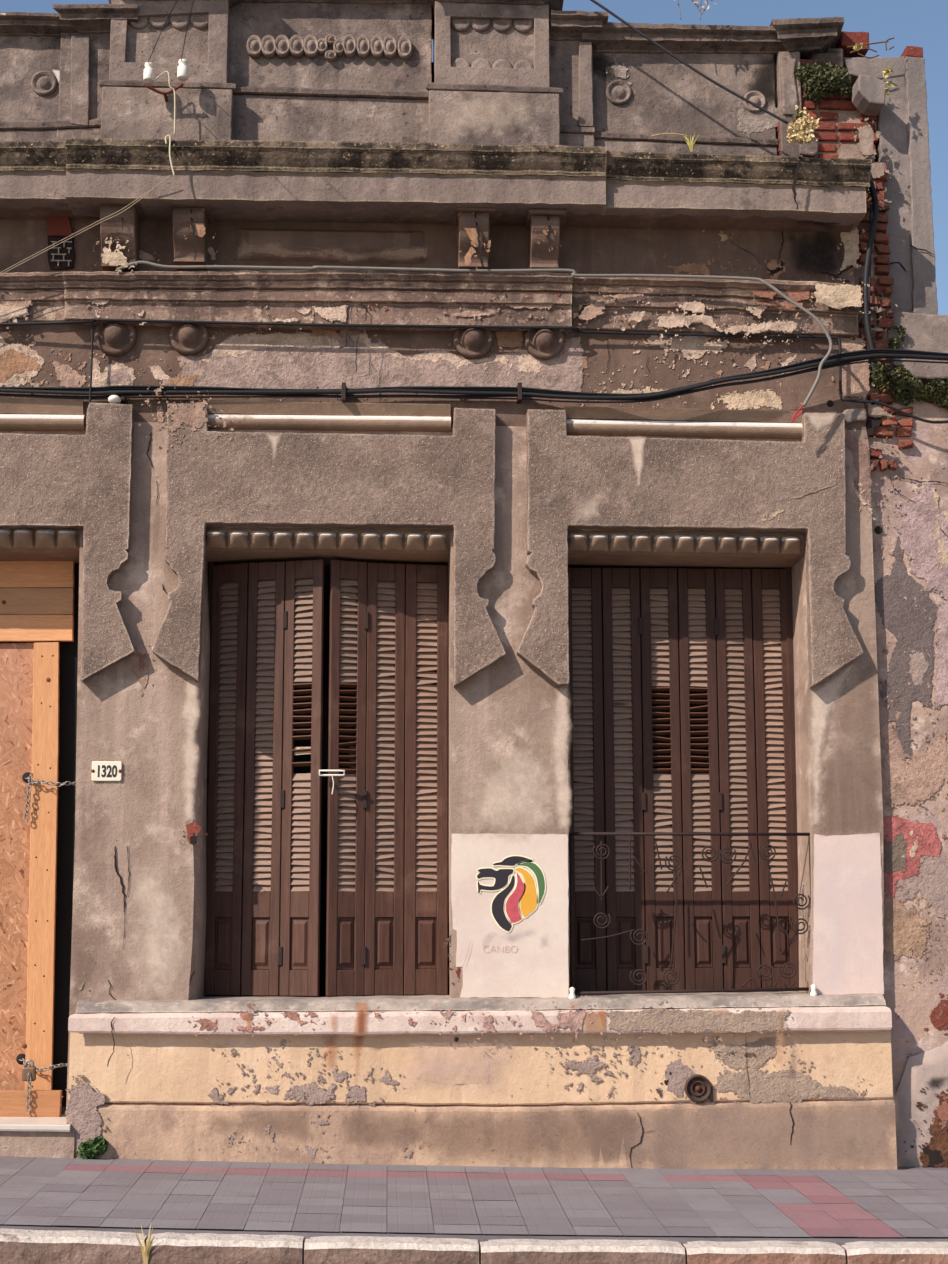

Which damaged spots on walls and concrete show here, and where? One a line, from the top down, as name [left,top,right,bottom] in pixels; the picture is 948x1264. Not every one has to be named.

spalling [852,75,886,116]
spalling [456,212,491,275]
crack [474,212,484,267]
crack [731,156,801,261]
peeling [0,227,870,454]
peeling [827,330,948,1035]
crack [114,846,130,945]
rust [356,1003,366,1045]
peeling [188,1003,406,1164]
crack [630,1113,652,1168]
crack [787,1102,795,1145]
spalling [904,1085,948,1168]